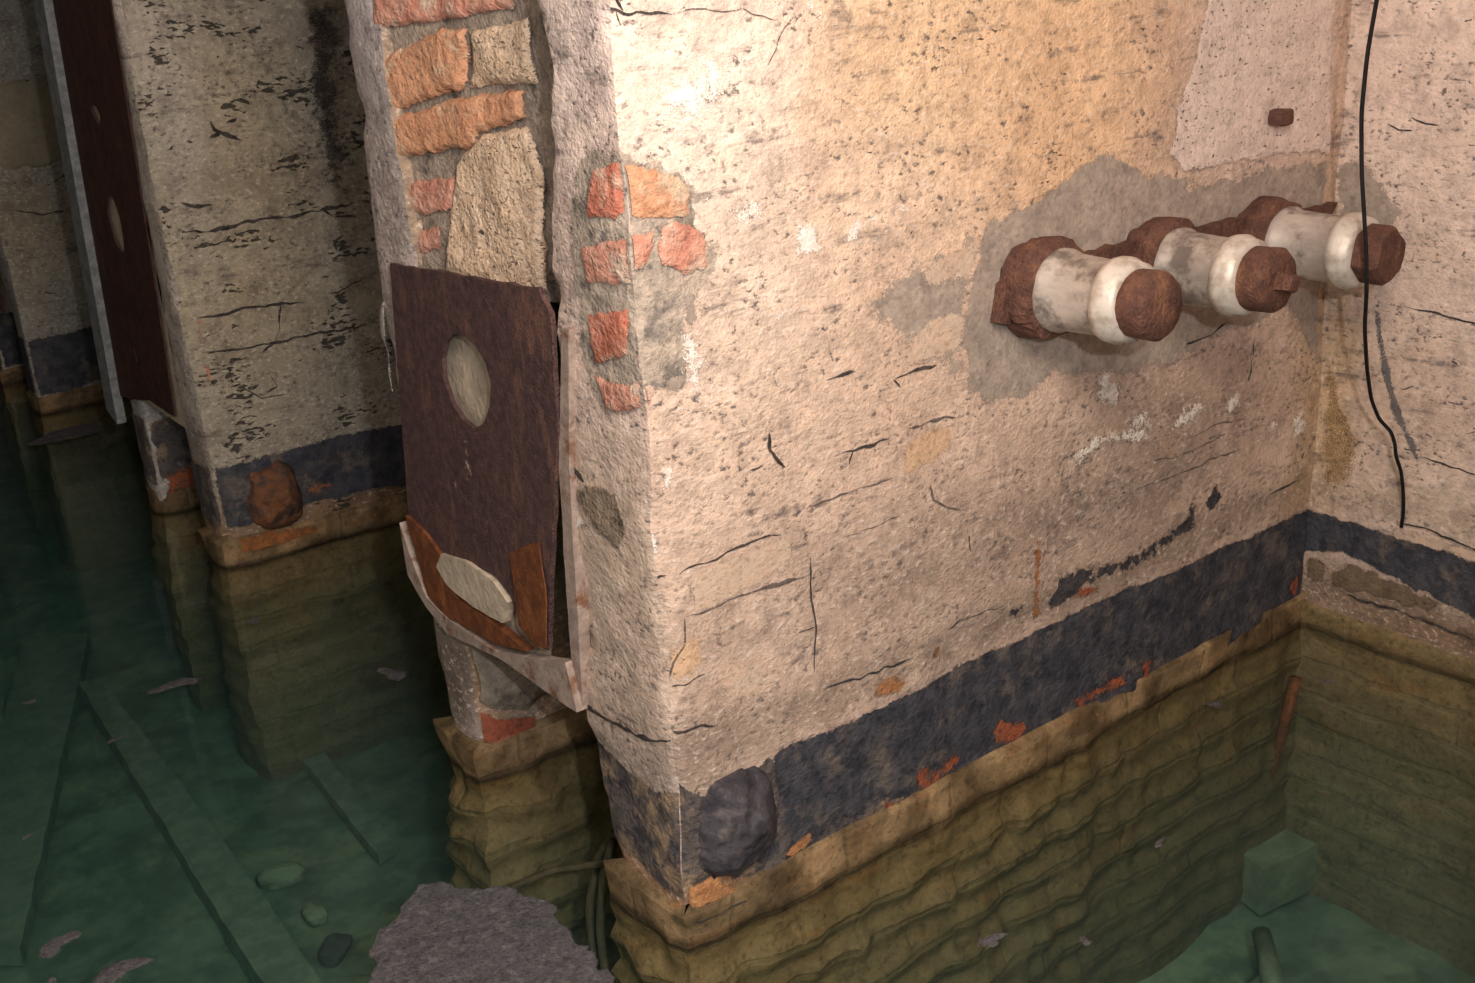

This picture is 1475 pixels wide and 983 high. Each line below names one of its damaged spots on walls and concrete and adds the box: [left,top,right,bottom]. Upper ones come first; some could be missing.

crack [609,0,793,65]
spalling [373,0,548,291]
spalling [568,37,769,422]
crack [199,279,375,399]
peeling [379,297,393,391]
crack [751,433,785,470]
crack [812,415,956,506]
corrosion [367,509,547,651]
crack [657,534,778,579]
crack [669,557,912,690]
damp [1047,485,1221,609]
crack [587,705,714,742]